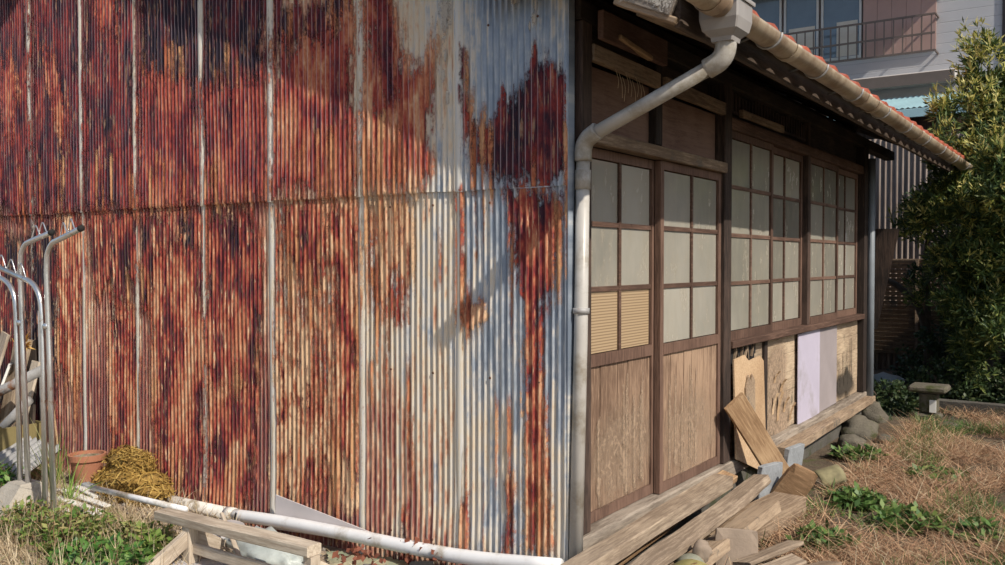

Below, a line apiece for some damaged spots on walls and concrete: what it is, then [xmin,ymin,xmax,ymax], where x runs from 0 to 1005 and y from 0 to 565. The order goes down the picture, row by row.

corrosion [0,0,441,519]
corrosion [451,41,568,557]